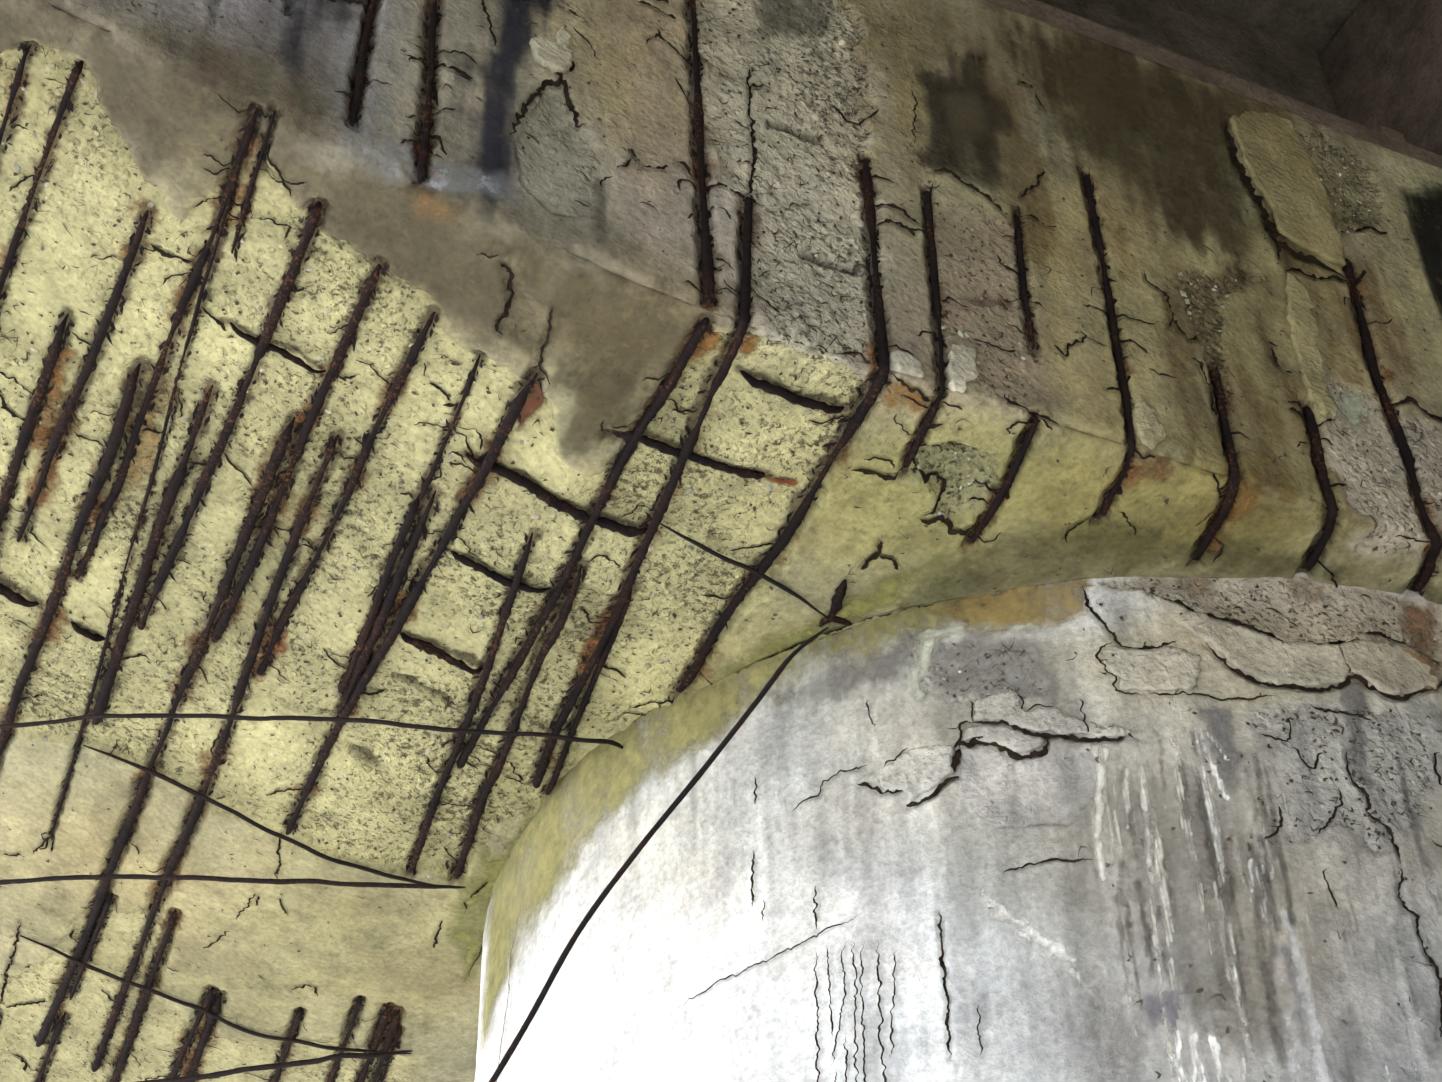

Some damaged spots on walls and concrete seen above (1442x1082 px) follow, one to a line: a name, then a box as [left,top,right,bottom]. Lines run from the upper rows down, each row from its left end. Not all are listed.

water stain [430,0,553,204]
water stain [918,52,1011,184]
water stain [1403,188,1442,313]
corrosion [29,349,75,448]
corrosion [123,387,168,490]
corrosion [517,381,545,431]
spalling [0,0,1065,1082]
corrosion [754,471,797,486]
spalling [1065,91,1442,855]
corrosion [1400,602,1439,692]
crack [794,586,1442,1058]
crack [750,851,765,920]